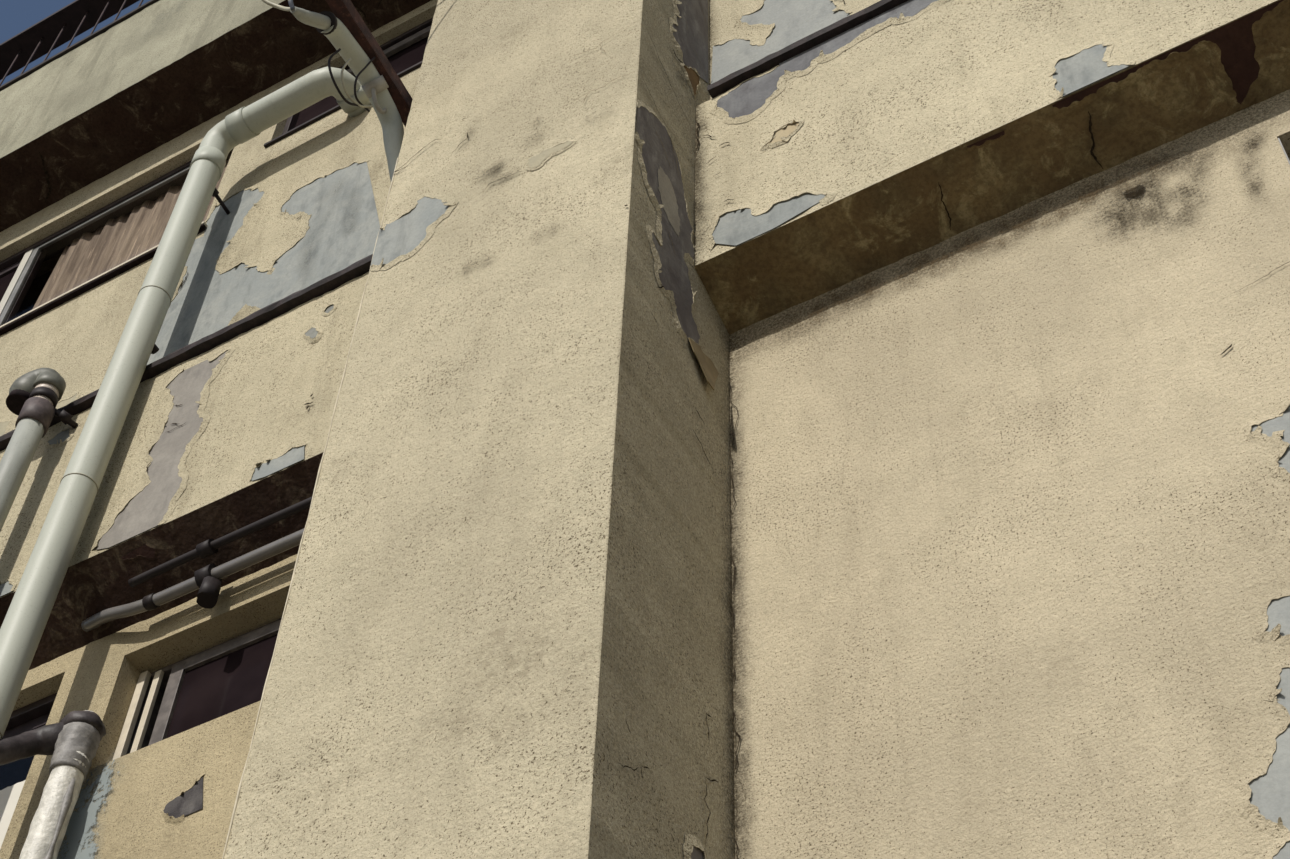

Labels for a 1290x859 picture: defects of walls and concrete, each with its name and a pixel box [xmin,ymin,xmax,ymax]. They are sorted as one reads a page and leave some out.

peeling [147,159,459,365]
peeling [635,99,837,390]
peeling [669,0,949,124]
crack [938,183,952,230]
leakage [761,145,1211,344]
crack [1088,111,1103,169]
peeling [0,420,13,436]
peeling [91,346,235,550]
peeling [249,443,307,481]
peeling [1239,397,1290,490]
leakage [727,522,749,859]
peeling [1235,588,1290,859]